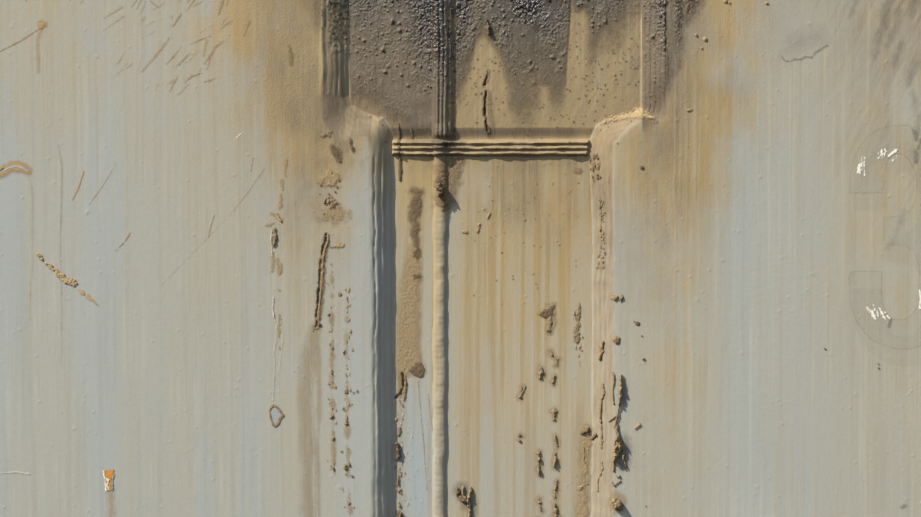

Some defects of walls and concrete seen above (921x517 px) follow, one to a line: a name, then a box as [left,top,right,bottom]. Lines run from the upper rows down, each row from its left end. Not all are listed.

damp [349,0,699,181]
peeling [36,253,98,305]
crack [313,233,329,332]